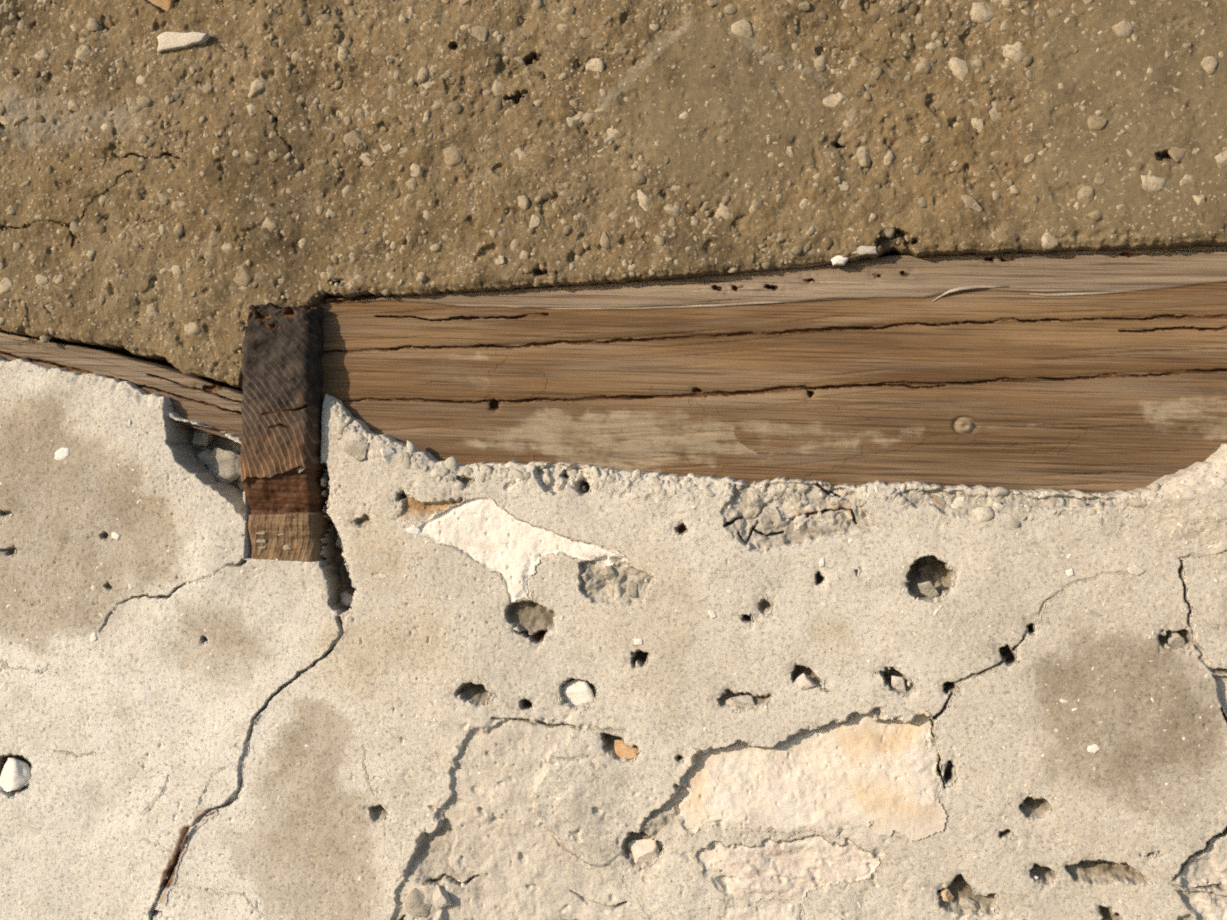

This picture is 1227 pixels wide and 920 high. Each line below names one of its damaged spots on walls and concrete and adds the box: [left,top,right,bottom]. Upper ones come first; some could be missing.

crack [99,558,247,633]
crack [143,885,269,920]
crack [192,616,344,827]
leakage [219,490,479,920]
peeling [390,718,656,920]
spalling [395,494,656,635]
spalling [533,462,594,496]
spalling [639,706,942,920]
crack [903,571,1129,790]
leakage [1013,575,1227,835]
crack [1168,826,1227,892]
crack [1178,518,1227,674]